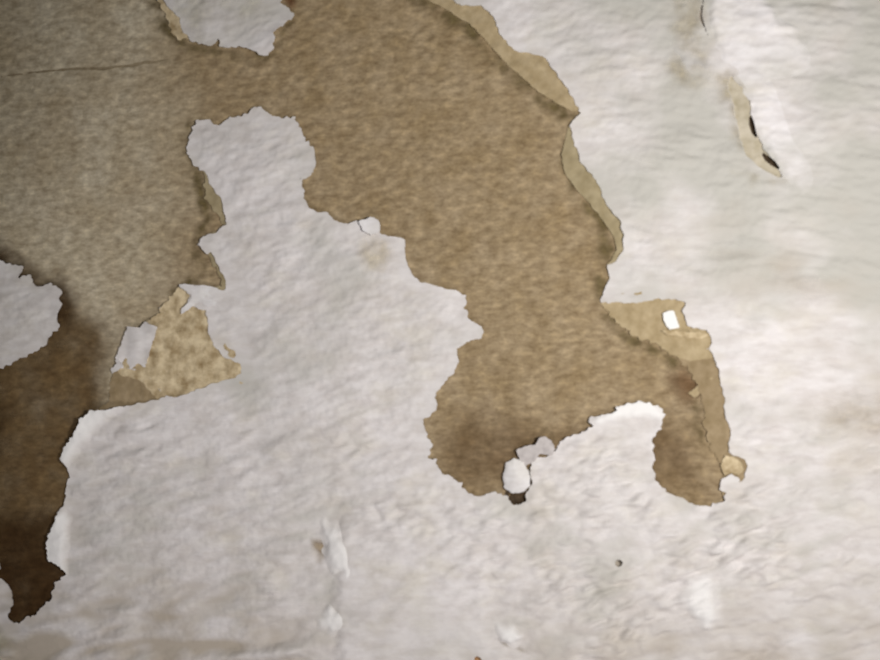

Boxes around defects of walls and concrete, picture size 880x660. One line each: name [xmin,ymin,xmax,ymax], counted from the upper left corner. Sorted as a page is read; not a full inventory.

crack [1,59,168,78]
peeling [708,0,814,195]
peeling [0,0,747,506]
peeling [46,507,73,578]